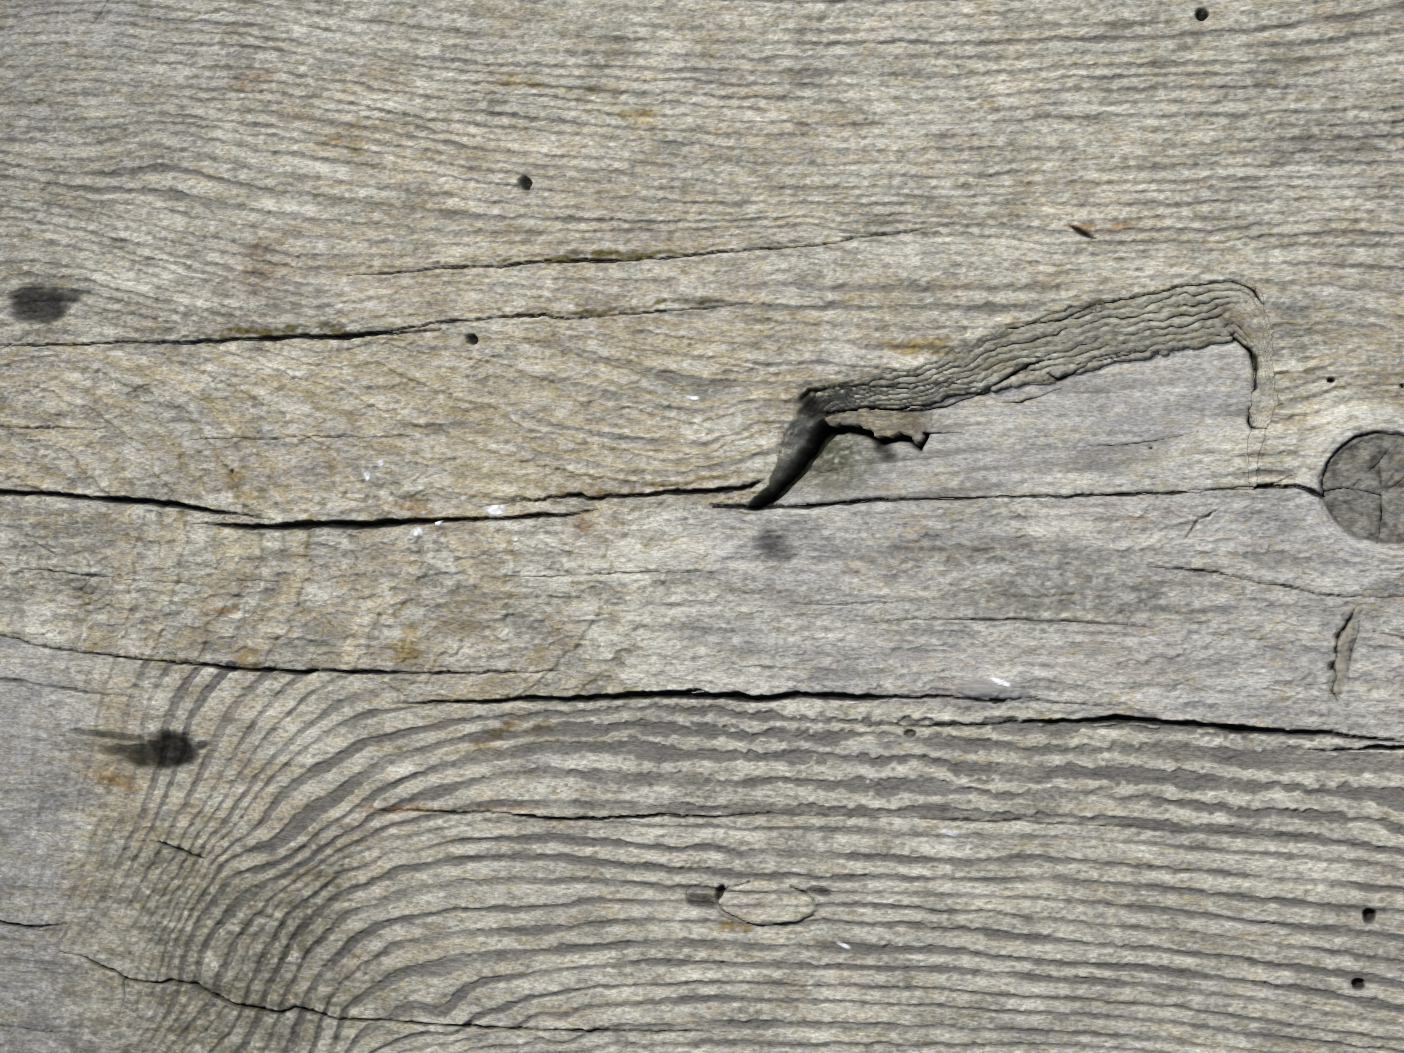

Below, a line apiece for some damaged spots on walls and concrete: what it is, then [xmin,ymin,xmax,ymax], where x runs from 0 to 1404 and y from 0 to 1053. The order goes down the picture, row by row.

crack [0,432,1404,530]
spalling [758,426,929,509]
crack [1164,566,1223,574]
crack [957,617,1109,625]
crack [1281,584,1352,695]
crack [44,646,1404,751]
crack [87,957,676,1032]